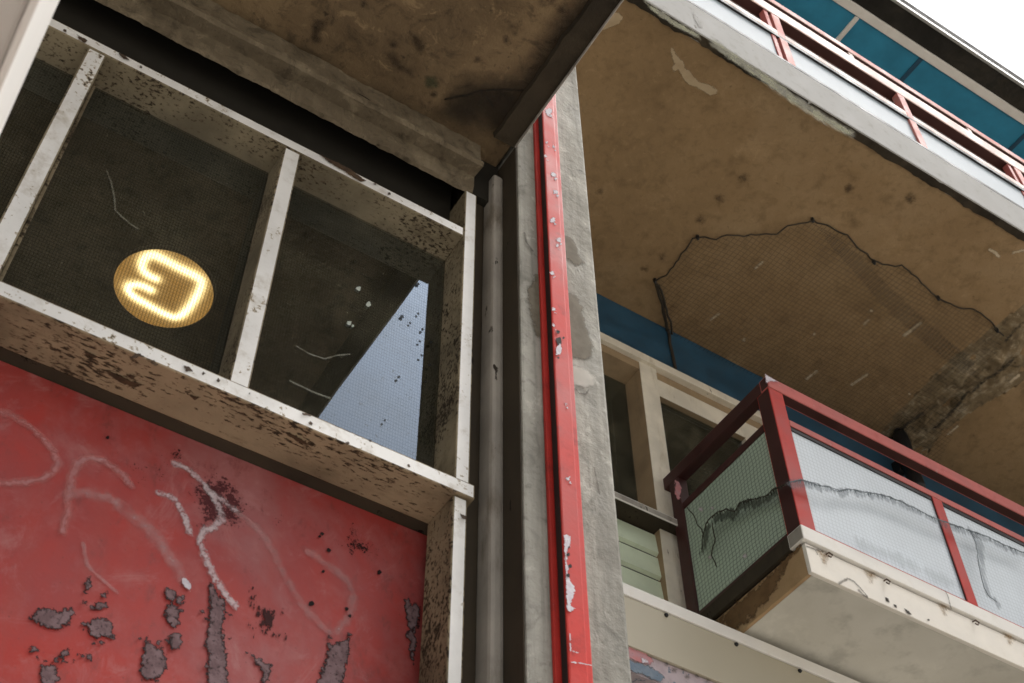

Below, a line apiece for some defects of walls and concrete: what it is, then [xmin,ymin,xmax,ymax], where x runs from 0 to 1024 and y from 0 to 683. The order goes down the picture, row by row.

spalling [880,304,1024,455]
peeling [28,576,116,683]
peeling [138,578,191,683]
peeling [200,582,233,683]
peeling [245,651,273,683]
peeling [248,587,287,641]
peeling [317,632,352,683]
peeling [563,534,576,612]